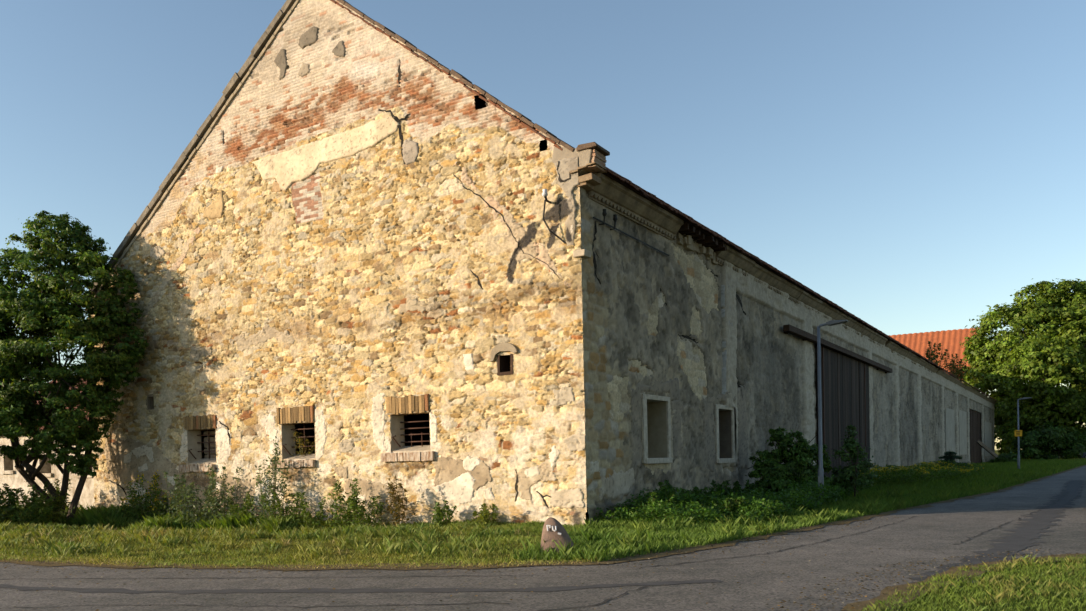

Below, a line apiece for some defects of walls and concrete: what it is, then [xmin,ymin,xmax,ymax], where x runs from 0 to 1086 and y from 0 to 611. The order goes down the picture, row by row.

spalling [647,293,665,336]
spalling [672,232,719,401]
spalling [607,360,653,422]
peeling [429,412,438,443]
peeling [432,455,495,504]
peeling [515,433,586,509]
peeling [589,461,671,501]